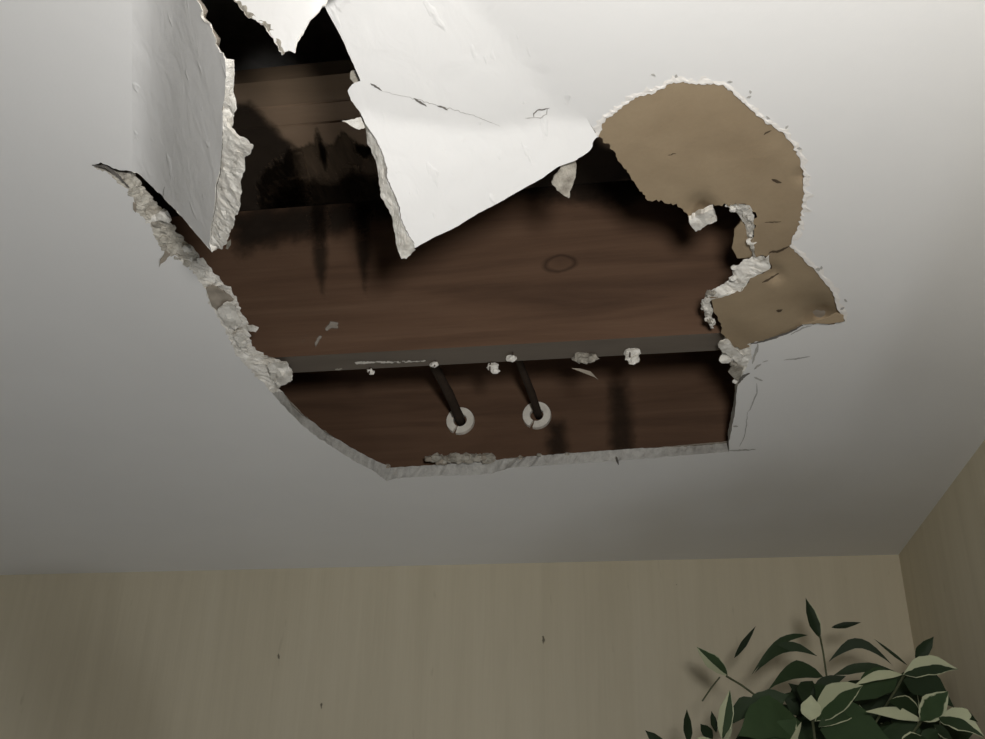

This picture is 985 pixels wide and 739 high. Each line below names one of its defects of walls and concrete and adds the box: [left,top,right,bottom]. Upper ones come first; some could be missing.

water stain [145,181,180,217]
spalling [94,162,293,393]
spalling [197,0,235,133]
spalling [238,0,328,55]
water stain [232,105,392,280]
peeling [343,111,365,129]
crack [371,84,496,125]
water stain [511,138,645,205]
peeling [593,74,848,388]
crack [729,326,811,451]